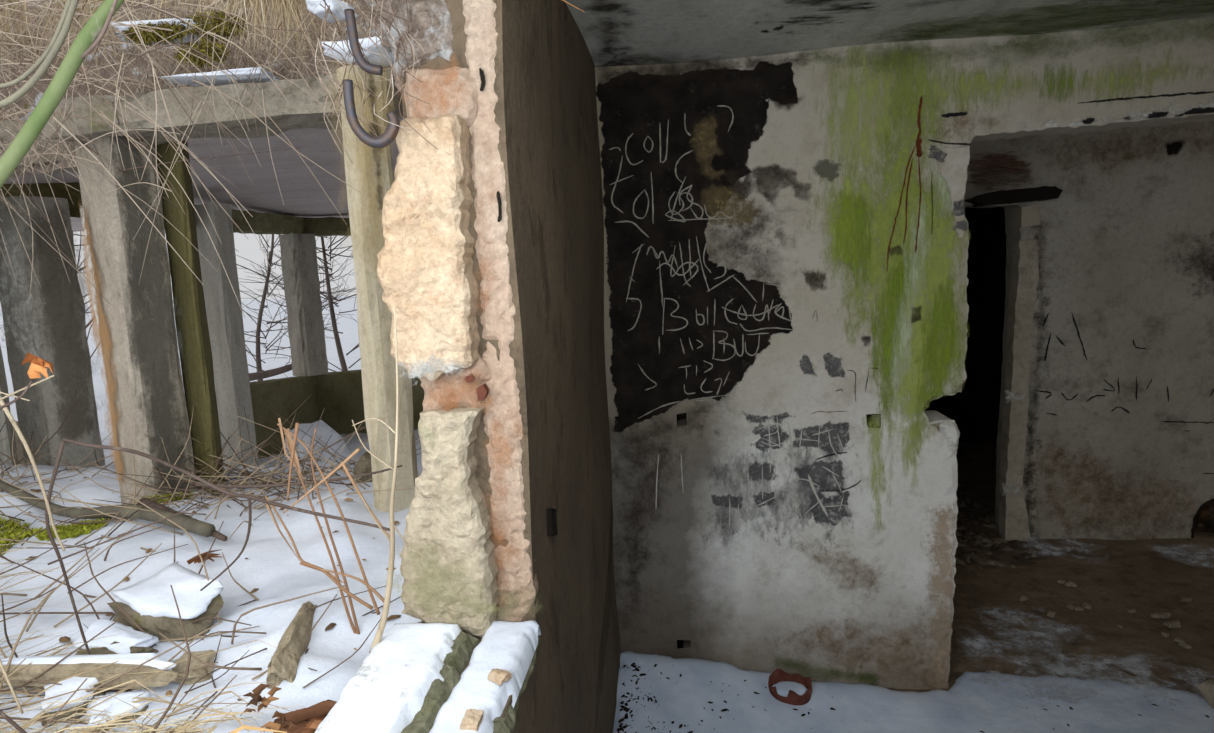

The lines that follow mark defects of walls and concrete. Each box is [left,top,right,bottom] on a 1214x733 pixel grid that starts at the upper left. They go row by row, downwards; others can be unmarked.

leakage [856,0,1214,72]
spalling [377,66,499,638]
peeling [596,58,810,584]
peeling [805,272,825,288]
leakage [815,160,871,283]
rust [887,96,933,269]
leakage [862,211,959,525]
peeling [711,411,861,546]